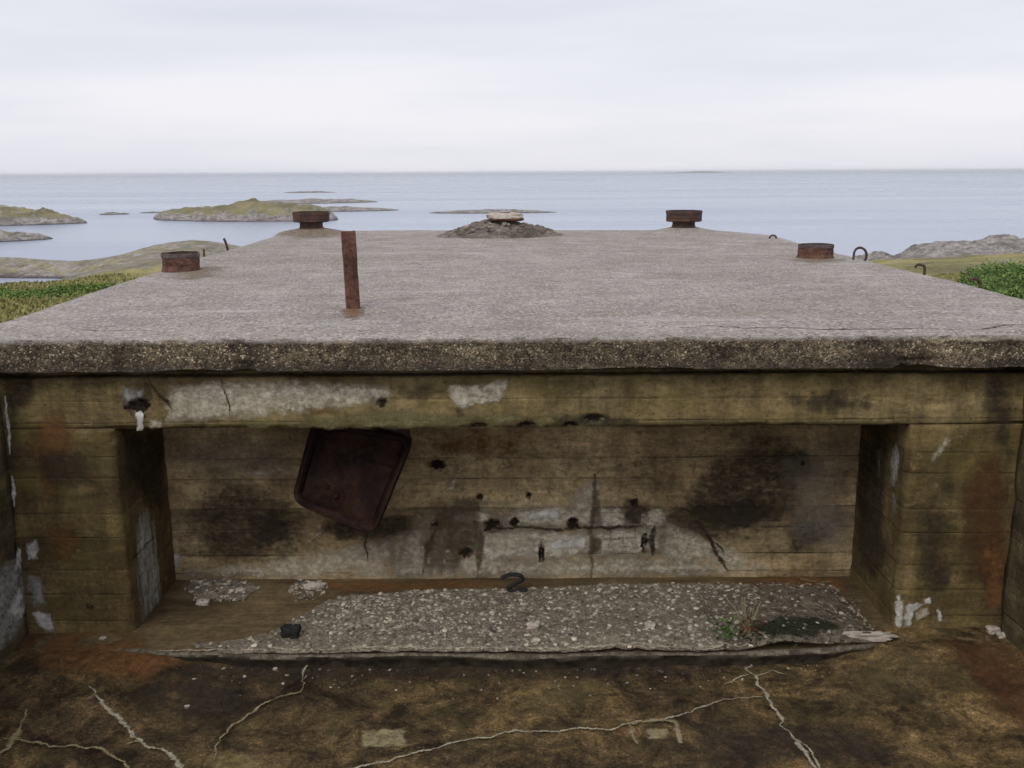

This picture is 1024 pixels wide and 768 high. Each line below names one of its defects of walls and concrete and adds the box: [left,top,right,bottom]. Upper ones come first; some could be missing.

peeling [449,381,507,428]
damp [124,380,389,611]
damp [190,437,806,578]
crack [696,520,728,571]
damp [895,513,949,627]
crack [0,686,183,768]
crack [214,675,307,760]
crack [355,664,820,768]